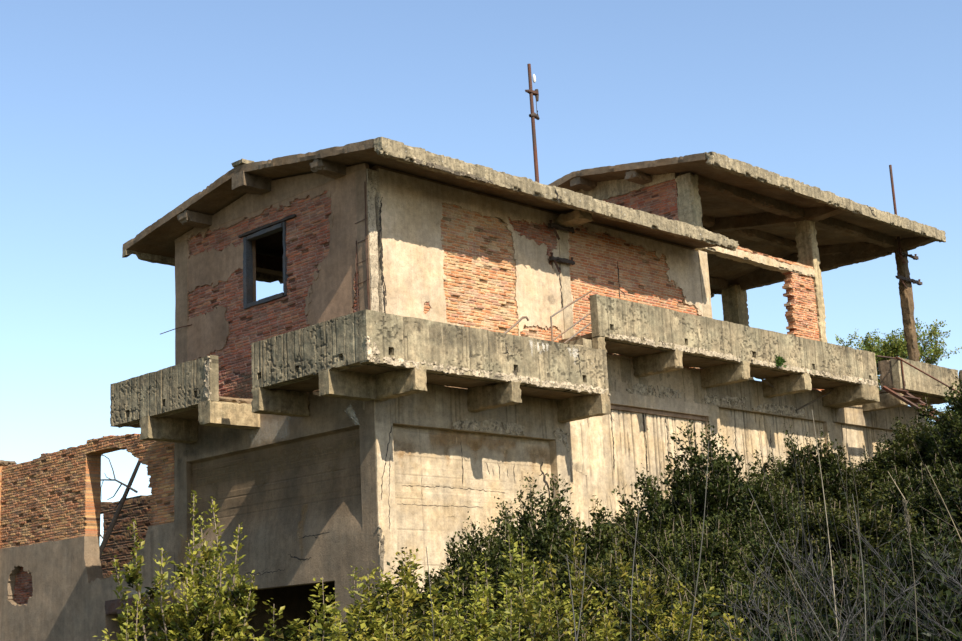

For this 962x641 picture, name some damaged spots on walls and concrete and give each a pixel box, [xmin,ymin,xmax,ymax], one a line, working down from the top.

flaking render [161,190,334,401]
flaking render [440,203,702,343]
spalling [608,334,879,387]
spalling [452,418,526,435]
crack [381,427,515,530]
crack [540,462,550,498]